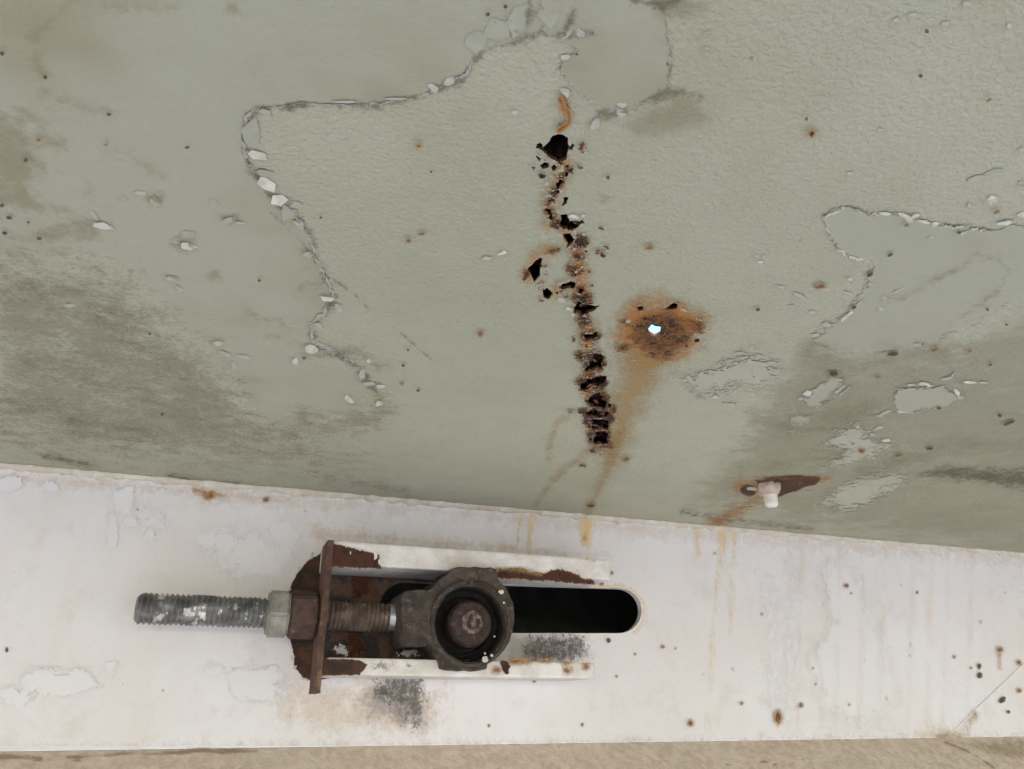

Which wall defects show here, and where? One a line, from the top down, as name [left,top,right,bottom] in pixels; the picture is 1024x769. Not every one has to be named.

peeling [0,0,683,431]
peeling [811,205,1024,355]
rust [590,298,710,463]
rust [711,475,827,554]
peeling [783,376,851,433]
peeling [814,371,988,516]